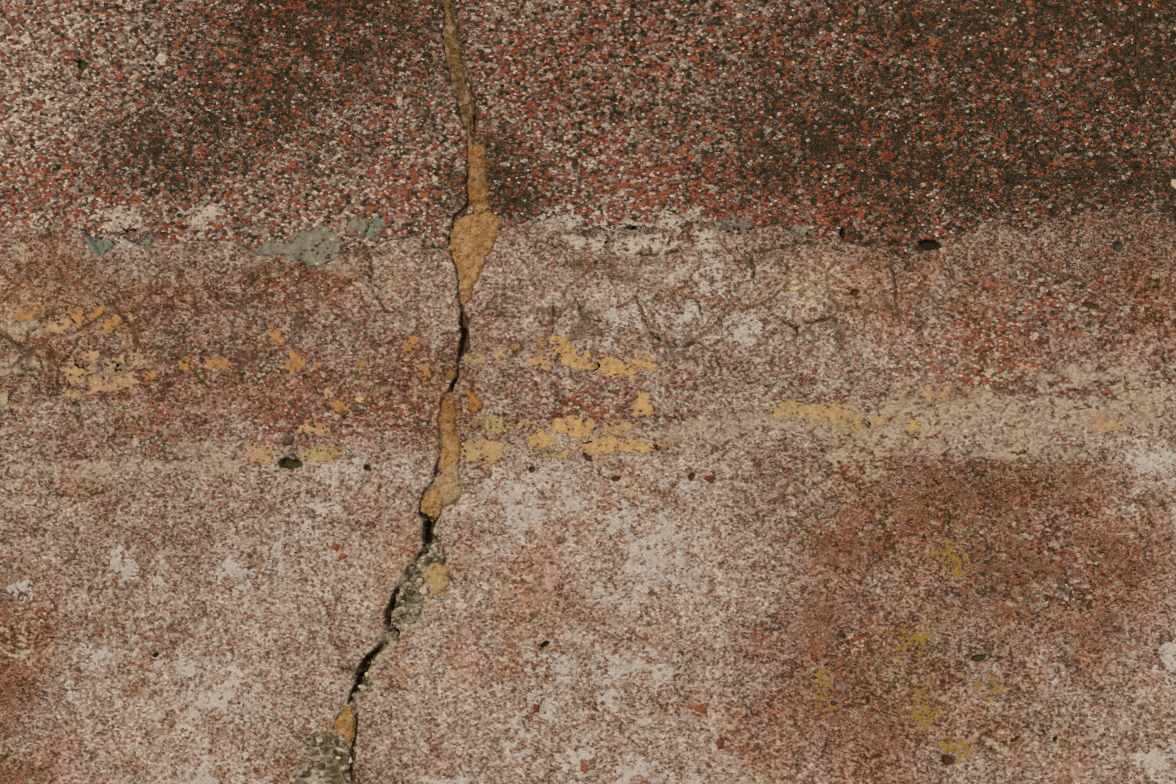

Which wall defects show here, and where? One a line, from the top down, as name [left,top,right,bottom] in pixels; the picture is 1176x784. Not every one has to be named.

water stain [480,0,1176,346]
crack [0,326,82,420]
crack [338,0,480,565]
peeling [402,334,420,355]
peeling [460,332,672,465]
crack [551,297,630,368]
crack [614,249,679,257]
crack [635,295,736,376]
crack [745,242,837,358]
flaking render [344,517,451,706]
crack [341,588,400,784]
flaking render [289,727,362,784]